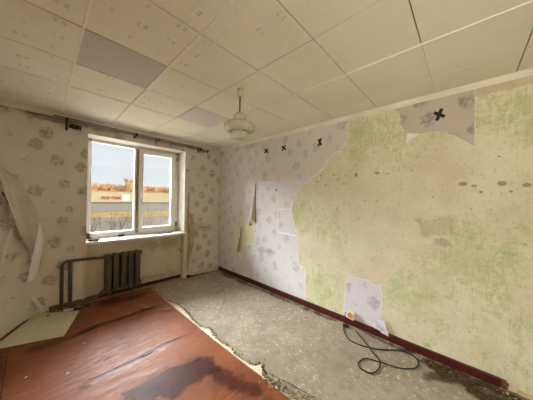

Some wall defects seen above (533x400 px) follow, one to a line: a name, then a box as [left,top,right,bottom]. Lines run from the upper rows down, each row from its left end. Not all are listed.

peeling [183,192,195,275]
flaking render [235,190,255,260]
peeling [291,83,533,396]
water stain [123,357,222,400]